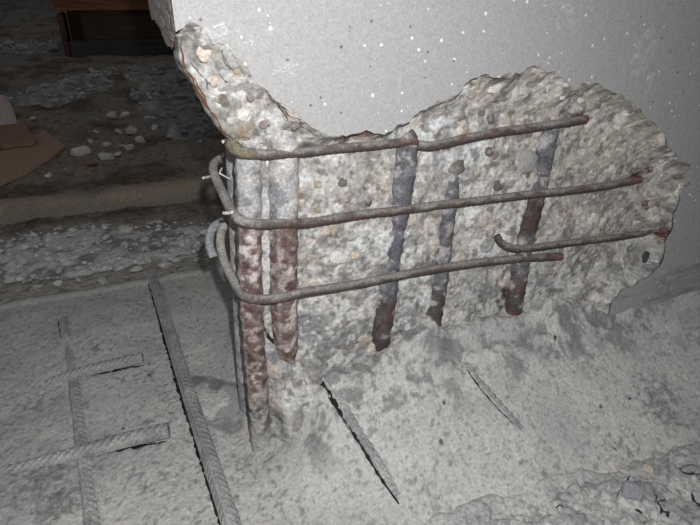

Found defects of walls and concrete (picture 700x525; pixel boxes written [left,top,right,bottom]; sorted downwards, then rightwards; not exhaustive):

spalling [153,0,691,444]
crack [90,365,144,376]
crack [90,441,166,458]
crack [148,283,221,525]
crack [320,381,399,505]
crack [466,369,514,425]